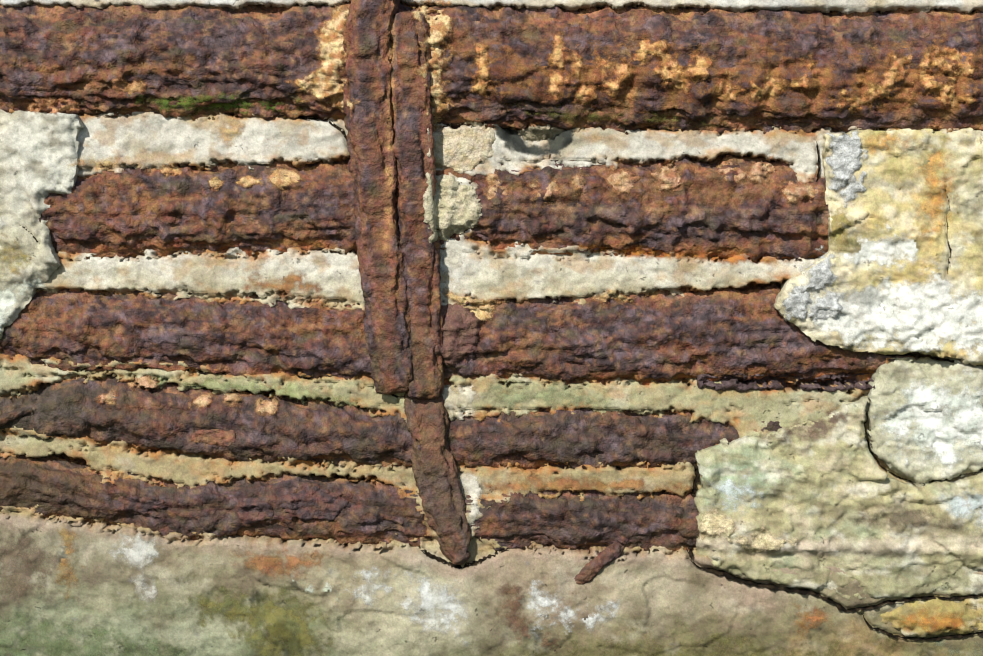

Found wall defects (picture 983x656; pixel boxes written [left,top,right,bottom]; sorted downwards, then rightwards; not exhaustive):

spalling [493,124,576,156]
peeling [825,130,868,208]
corrosion [580,245,769,264]
corrosion [245,274,321,302]
peeling [783,246,843,322]
corrosion [696,373,875,392]
corrosion [191,428,236,447]
peeling [698,510,797,553]
corrosion [574,541,625,585]
efflorescence [355,571,392,604]
efflorescence [402,578,467,632]
efflorescence [528,581,618,628]